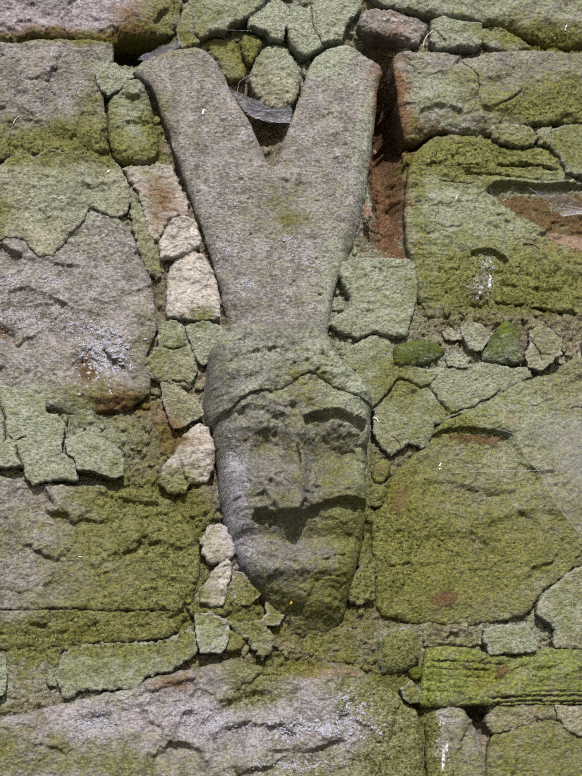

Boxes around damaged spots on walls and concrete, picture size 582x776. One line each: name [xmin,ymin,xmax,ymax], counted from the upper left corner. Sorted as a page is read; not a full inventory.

crack [0,406,24,465]